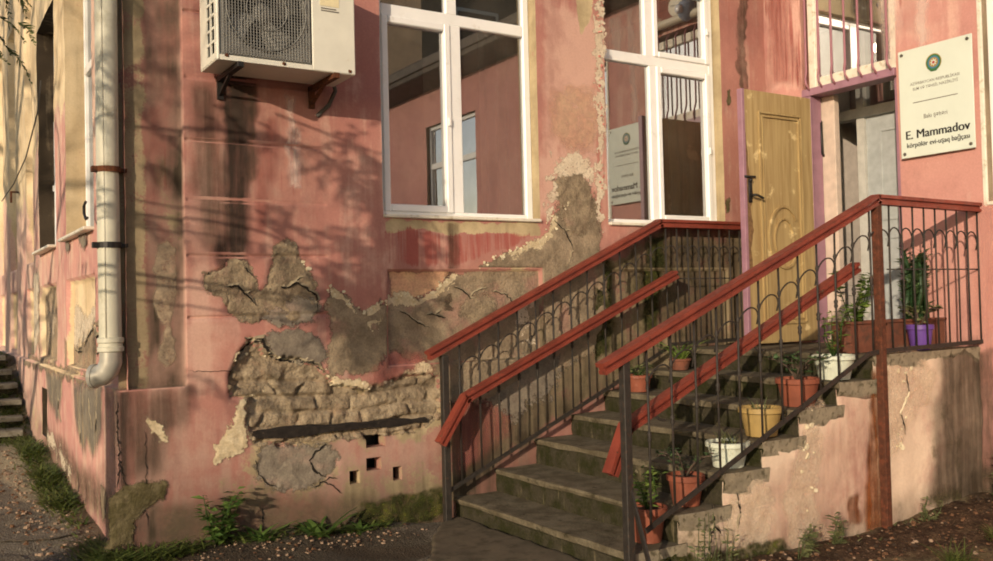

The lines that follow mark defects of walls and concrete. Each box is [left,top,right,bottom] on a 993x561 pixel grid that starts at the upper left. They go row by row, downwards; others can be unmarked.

leakage [203,76,263,269]
peeling [201,0,609,447]
peeling [24,266,99,390]
leakage [46,392,172,551]
peeling [146,418,169,443]